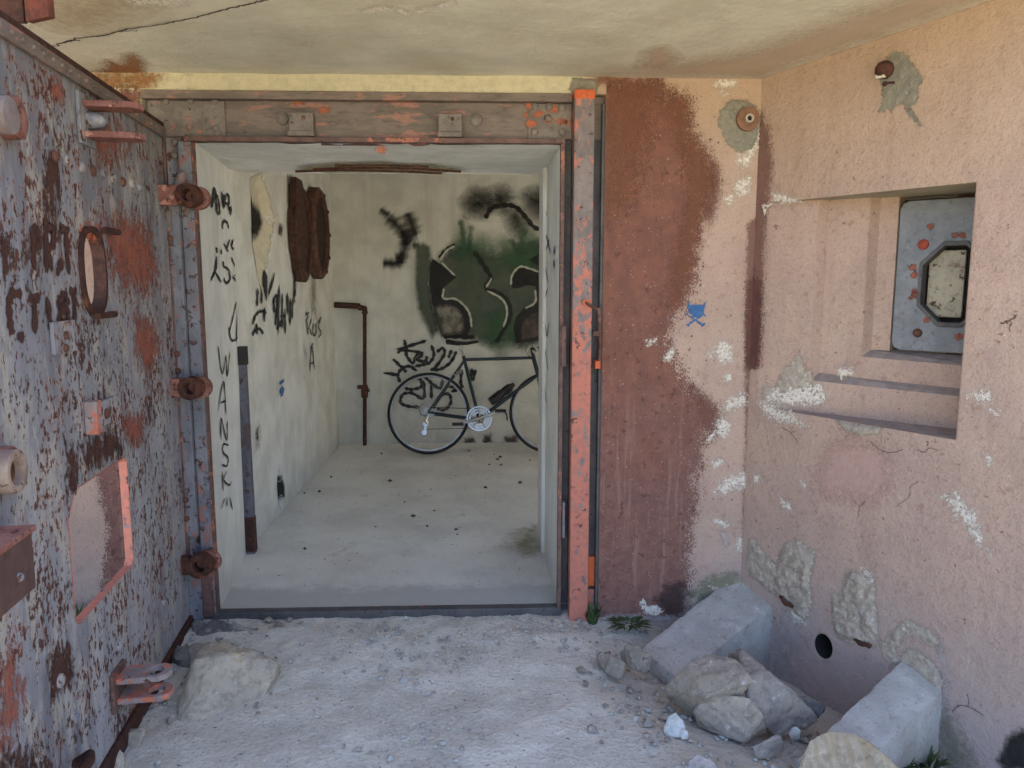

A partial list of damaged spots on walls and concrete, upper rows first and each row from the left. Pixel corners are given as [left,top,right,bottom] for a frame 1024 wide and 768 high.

crack [53,0,268,46]
rust [96,55,159,88]
rust [40,140,63,226]
peeling [701,113,802,225]
rust [0,231,16,287]
rust [80,200,164,384]
damp [742,113,774,472]
rust [64,412,146,503]
rust [0,641,52,768]
rust [45,638,75,711]